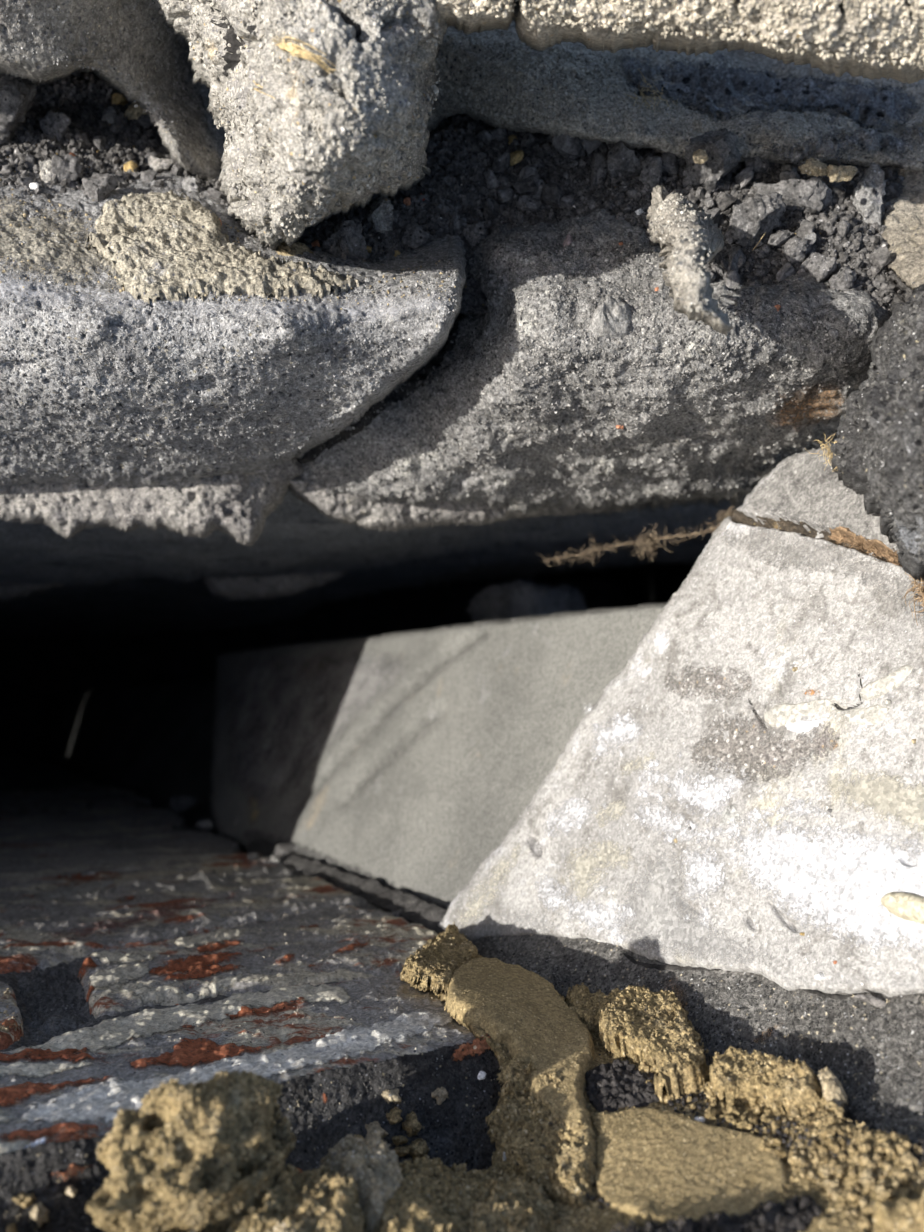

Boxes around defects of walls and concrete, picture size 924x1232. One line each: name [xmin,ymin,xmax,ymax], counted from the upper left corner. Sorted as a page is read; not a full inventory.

crack [834,669,863,711]
crack [748,698,767,729]
peeling [149,940,242,980]
peeling [0,957,100,1062]
peeling [214,997,304,1020]
peeling [130,1022,279,1069]
peeling [0,1076,110,1107]
peeling [0,1122,99,1142]